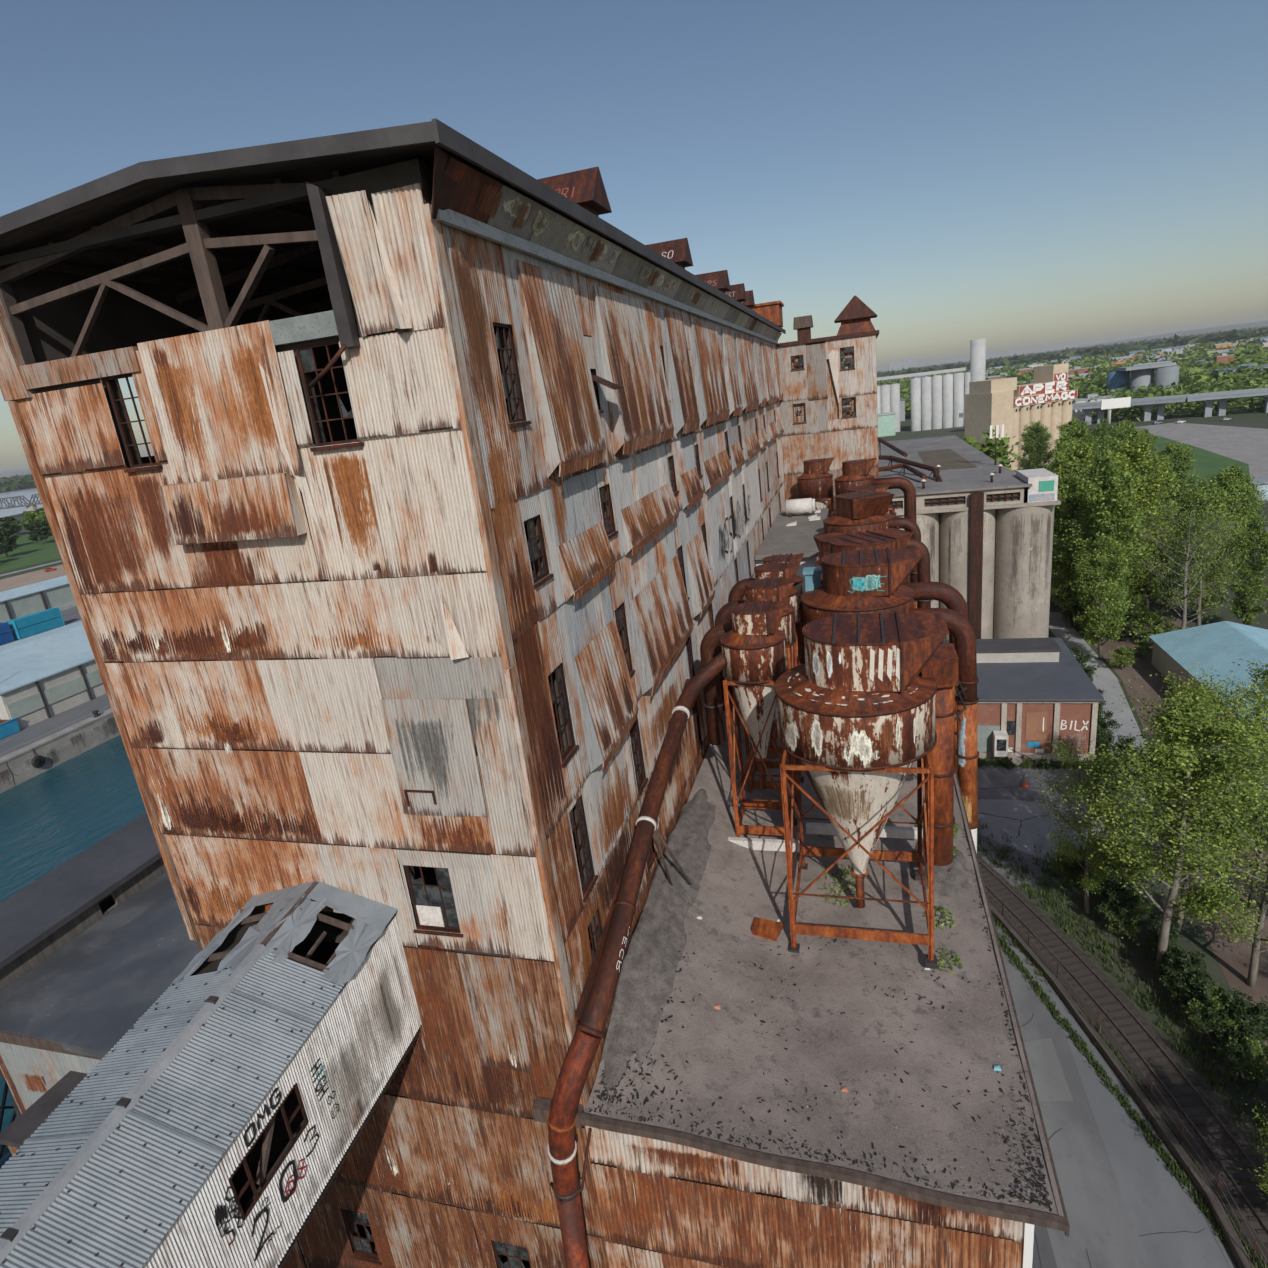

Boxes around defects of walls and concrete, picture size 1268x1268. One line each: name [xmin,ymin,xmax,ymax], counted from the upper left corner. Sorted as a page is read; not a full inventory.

rust [153,349,208,467]
rust [222,336,279,449]
rust [541,299,601,545]
rust [323,452,383,579]
rust [97,618,267,663]
peeling [788,648,918,706]
peeling [777,710,823,758]
peeling [844,730,879,767]
peeling [896,718,916,748]
rust [163,788,318,836]
rust [571,662,635,997]
rust [632,1144,739,1177]